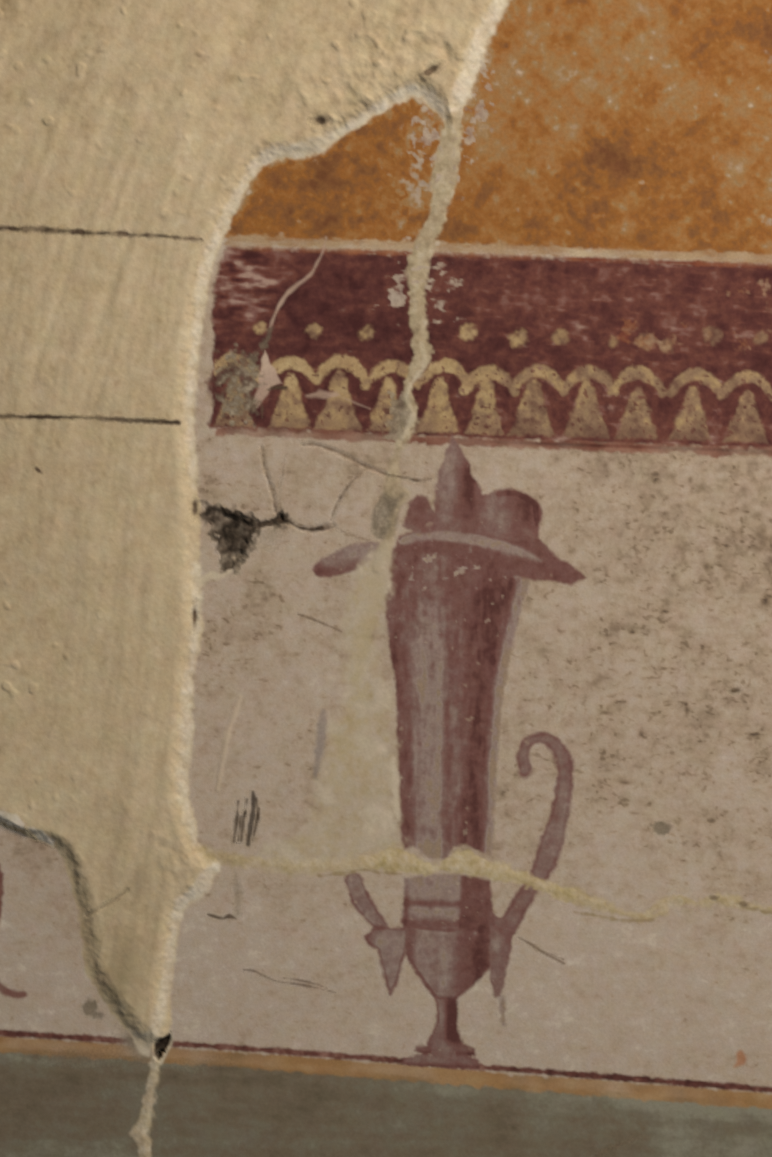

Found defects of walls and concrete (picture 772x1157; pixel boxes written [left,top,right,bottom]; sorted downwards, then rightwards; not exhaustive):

spalling [415,59,447,82]
spalling [307,111,333,130]
crack [247,53,504,545]
peeling [205,341,290,431]
peeling [303,387,341,400]
spalling [189,494,294,638]
peeling [0,810,57,848]
crack [191,842,772,925]
crack [127,1063,163,1157]